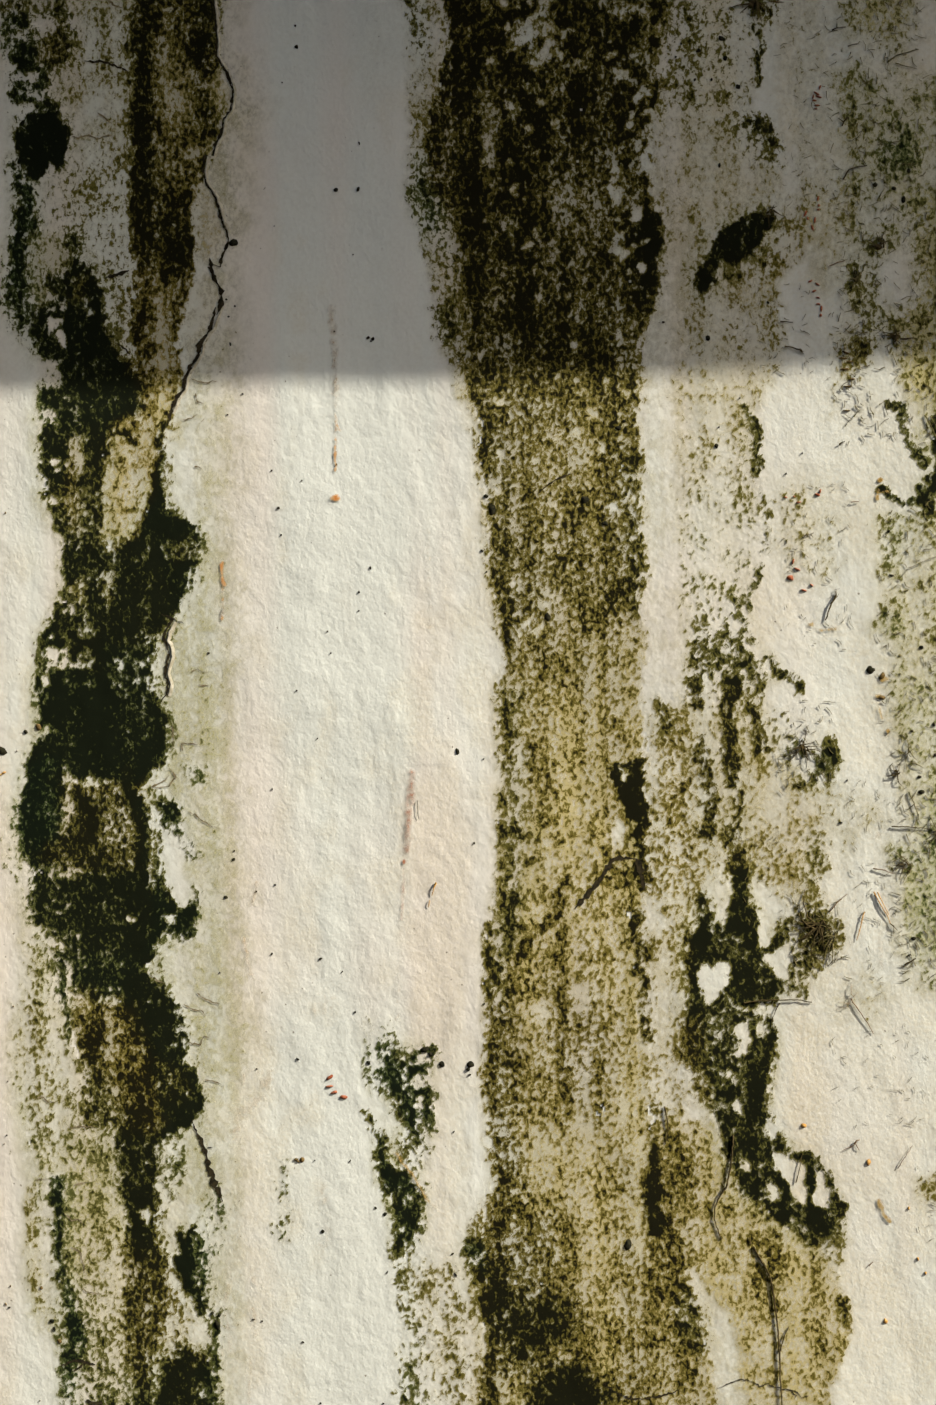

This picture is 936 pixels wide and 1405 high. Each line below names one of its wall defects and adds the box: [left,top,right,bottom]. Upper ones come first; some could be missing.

damp [0,0,245,1405]
crack [167,0,234,427]
damp [354,0,854,1405]
damp [866,666,885,700]